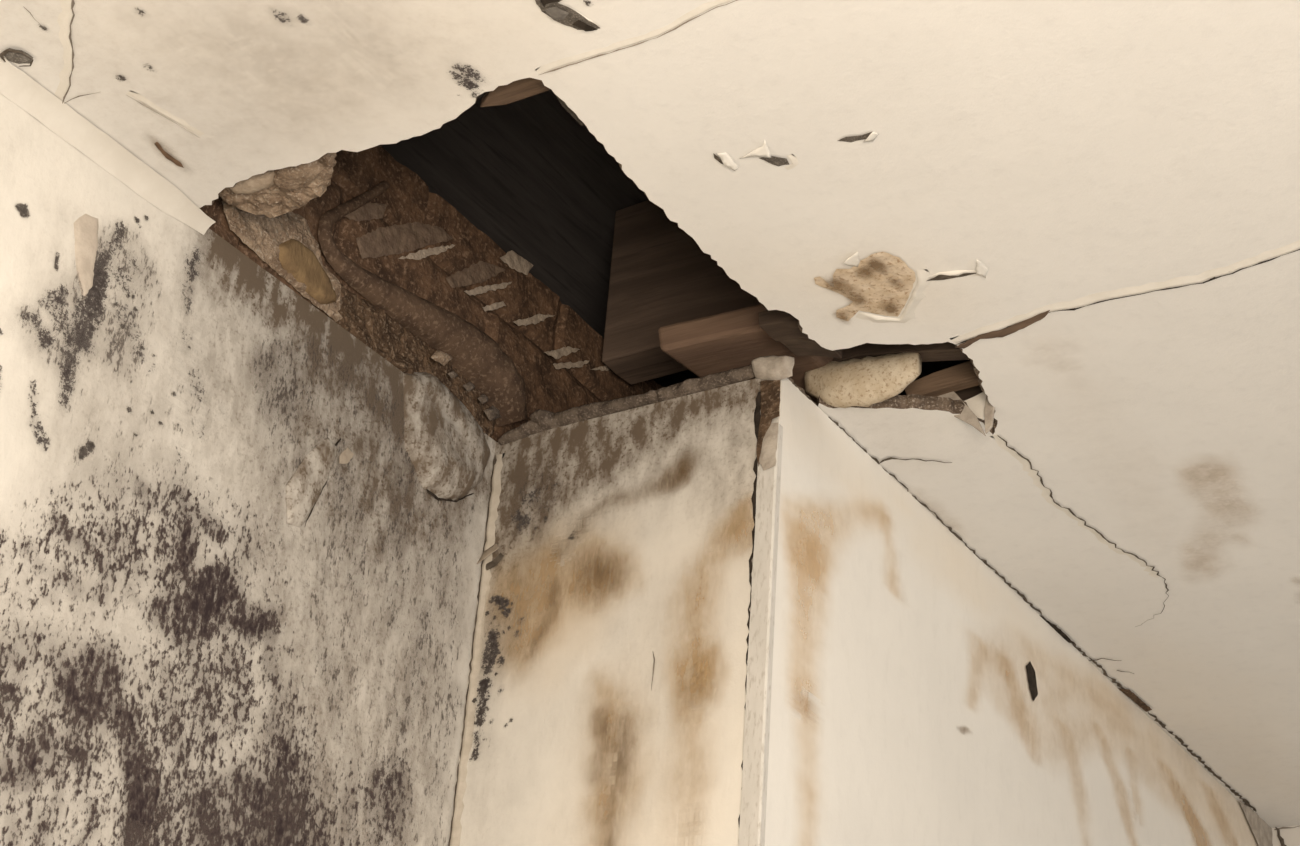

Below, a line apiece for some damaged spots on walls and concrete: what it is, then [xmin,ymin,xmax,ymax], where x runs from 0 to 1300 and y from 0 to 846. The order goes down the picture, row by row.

spalling [535,0,600,31]
crack [535,0,737,75]
spalling [713,140,799,171]
spalling [838,132,879,142]
damp [20,215,159,412]
damp [183,248,200,312]
flaking render [200,145,780,471]
peeling [814,252,989,323]
crack [951,240,1300,349]
damp [0,339,613,846]
crack [745,391,761,708]
crack [792,383,1299,830]